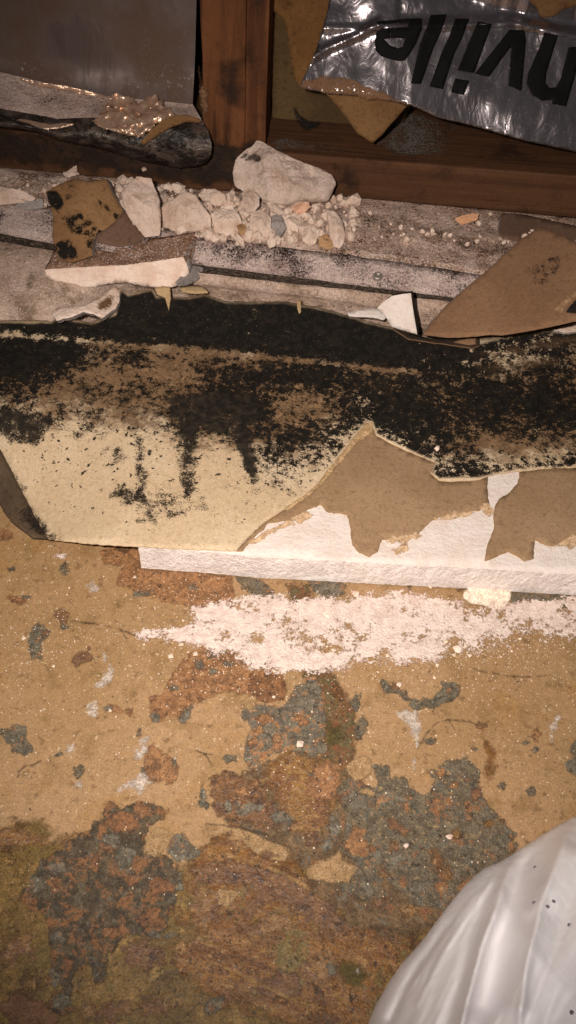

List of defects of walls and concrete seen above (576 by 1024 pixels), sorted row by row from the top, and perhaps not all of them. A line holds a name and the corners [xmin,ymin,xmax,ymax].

water stain [0,291,576,530]
water stain [19,506,59,541]
peeling [308,580,347,597]
water stain [302,666,362,803]
water stain [0,824,81,851]